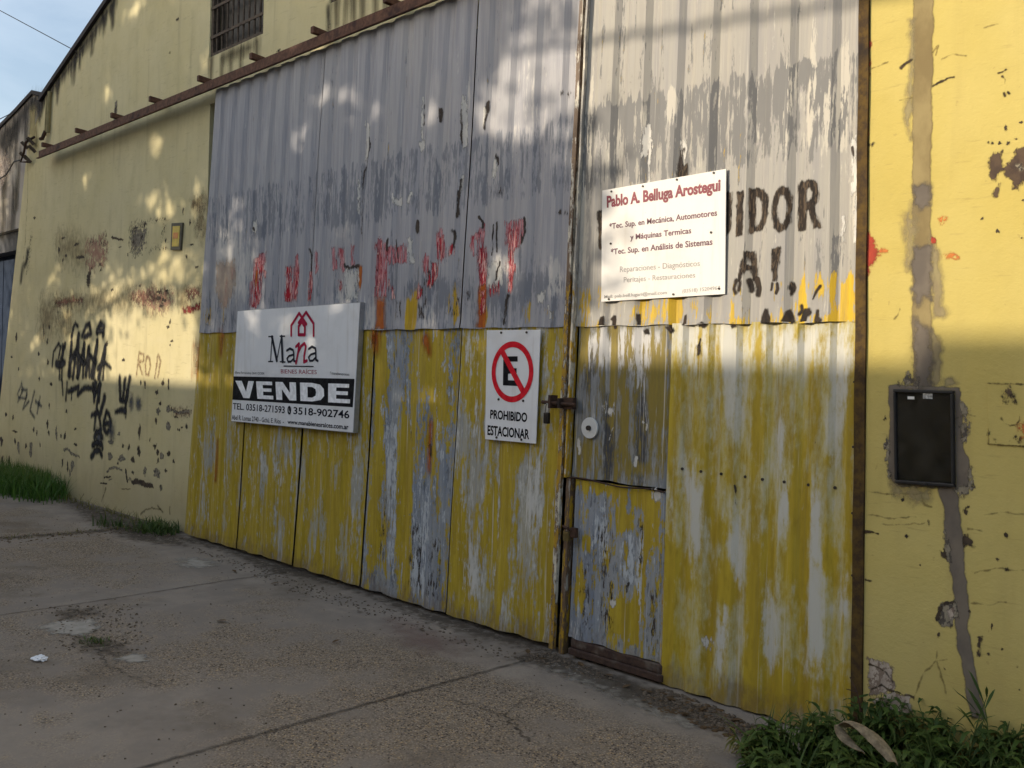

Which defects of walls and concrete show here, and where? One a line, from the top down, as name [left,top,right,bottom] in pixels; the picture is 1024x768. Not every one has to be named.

peeling [639,123,653,183]
peeling [678,139,687,172]
peeling [987,125,1024,201]
peeling [332,245,360,301]
peeling [374,175,464,319]
peeling [450,215,524,325]
peeling [408,516,441,600]
peeling [580,523,616,633]
peeling [935,601,971,636]
peeling [866,656,914,716]